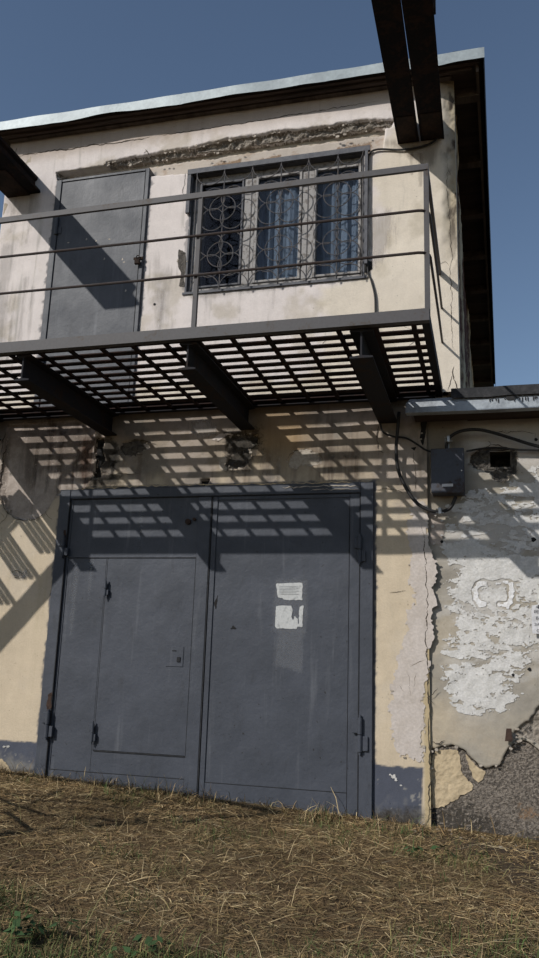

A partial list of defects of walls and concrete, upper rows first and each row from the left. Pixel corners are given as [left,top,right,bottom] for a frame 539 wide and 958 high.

spalling [103,120,394,171]
spalling [67,433,364,491]
peeling [387,449,539,840]